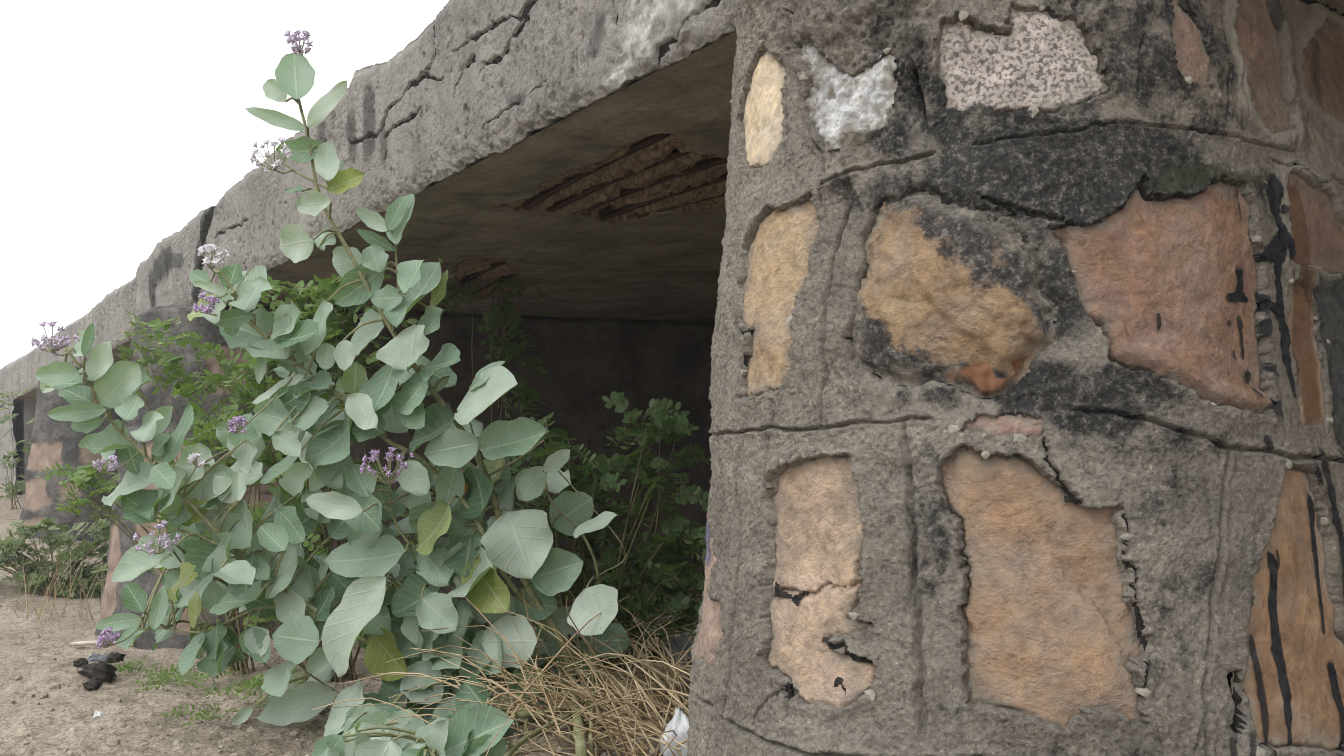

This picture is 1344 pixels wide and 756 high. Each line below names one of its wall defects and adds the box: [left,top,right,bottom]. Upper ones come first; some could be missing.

crack [350,0,538,144]
crack [658,0,721,64]
peeling [743,39,900,169]
crack [1299,0,1344,16]
spalling [493,133,728,224]